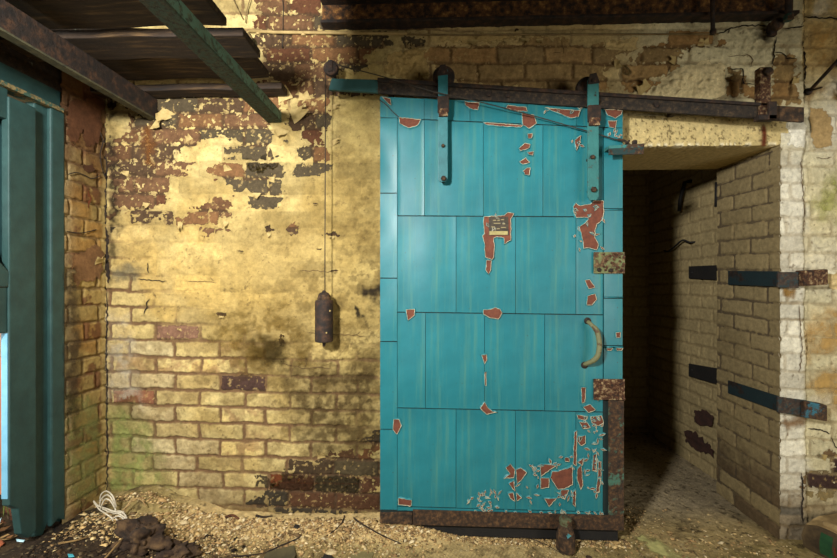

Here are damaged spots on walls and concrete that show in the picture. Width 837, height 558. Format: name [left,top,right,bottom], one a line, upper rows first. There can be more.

peeling [83,0,726,238]
peeling [723,66,755,99]
crack [719,0,837,103]
peeling [771,53,802,106]
peeling [245,430,380,515]
peeling [799,449,837,502]